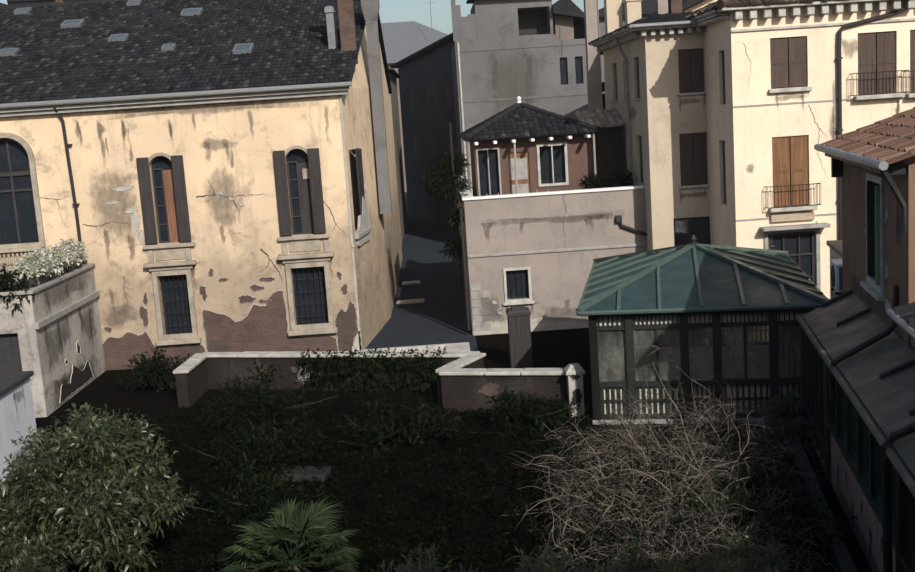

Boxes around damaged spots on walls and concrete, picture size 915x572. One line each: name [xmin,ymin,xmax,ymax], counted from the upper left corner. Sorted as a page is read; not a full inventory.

crack [40,196,126,238]
crack [196,180,264,218]
crack [260,249,283,282]
peeling [103,268,362,370]
peeling [59,341,94,403]